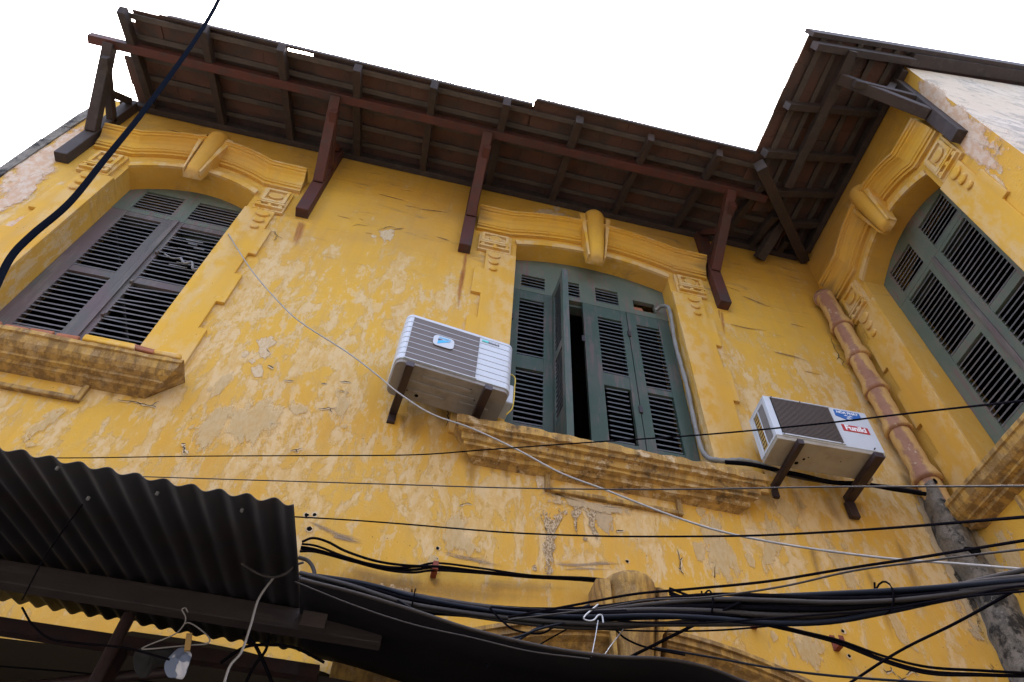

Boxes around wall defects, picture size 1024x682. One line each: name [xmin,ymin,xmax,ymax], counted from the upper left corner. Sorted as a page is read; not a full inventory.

peeling [0,126,83,211]
peeling [918,80,1007,198]
peeling [242,336,276,377]
peeling [181,371,308,456]
spalling [532,475,632,586]